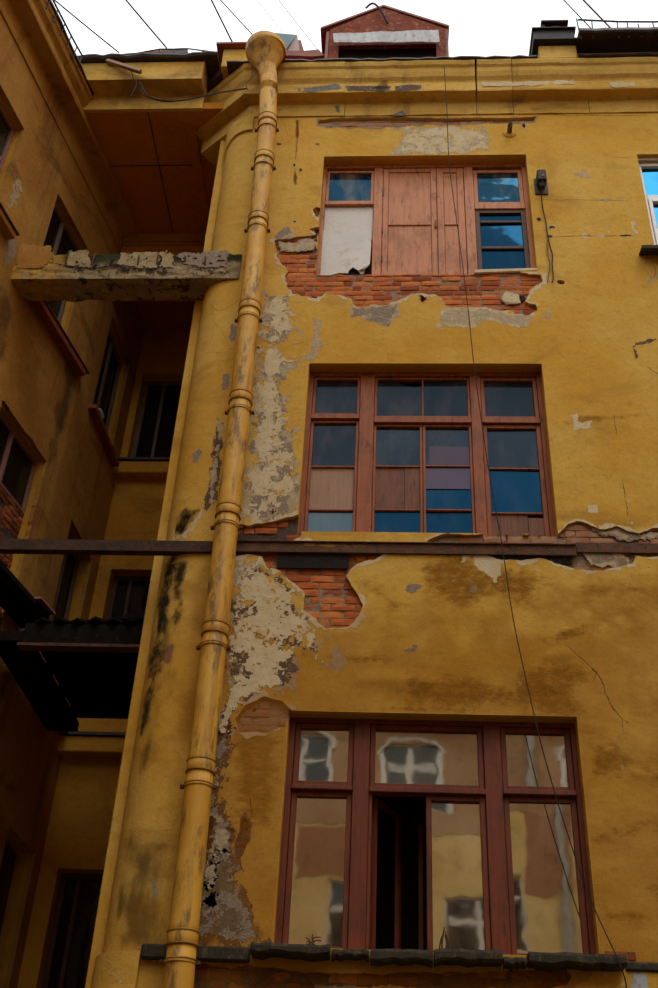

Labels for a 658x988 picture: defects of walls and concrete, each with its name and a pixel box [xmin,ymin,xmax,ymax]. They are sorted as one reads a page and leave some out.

peeling [316,105,538,155]
peeling [3,236,54,269]
spalling [64,250,96,268]
spalling [117,250,229,268]
flaking render [237,206,565,541]
flaking render [425,505,658,583]
peeling [406,584,422,594]
water stain [424,558,531,602]
water stain [142,557,186,728]
water stain [408,666,584,712]
crack [566,644,628,733]
peeling [198,554,388,947]